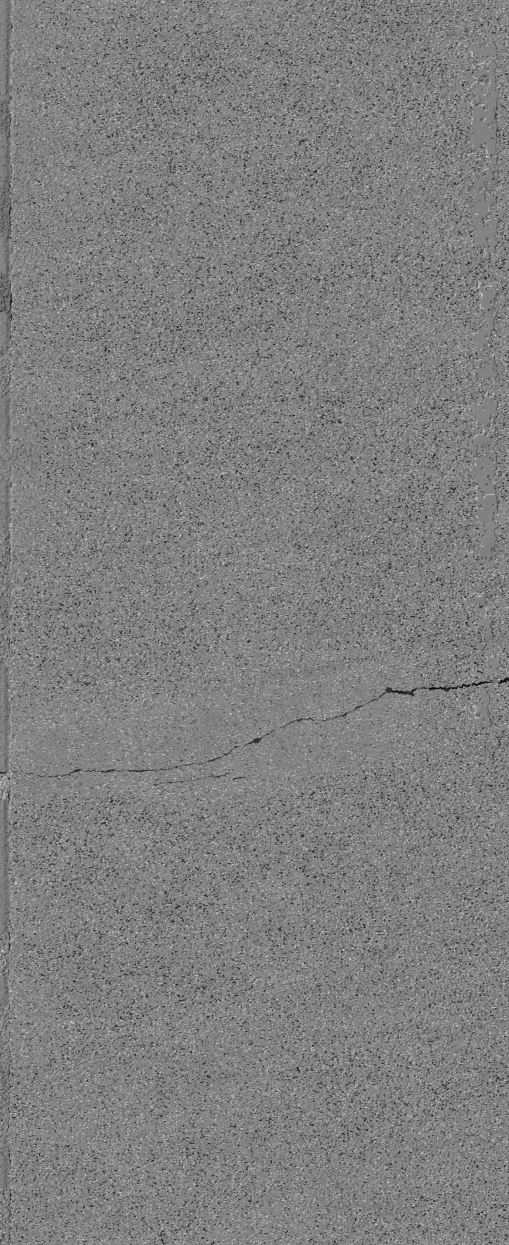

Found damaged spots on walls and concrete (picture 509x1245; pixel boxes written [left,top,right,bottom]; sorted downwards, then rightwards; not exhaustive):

crack [9,678,509,785]